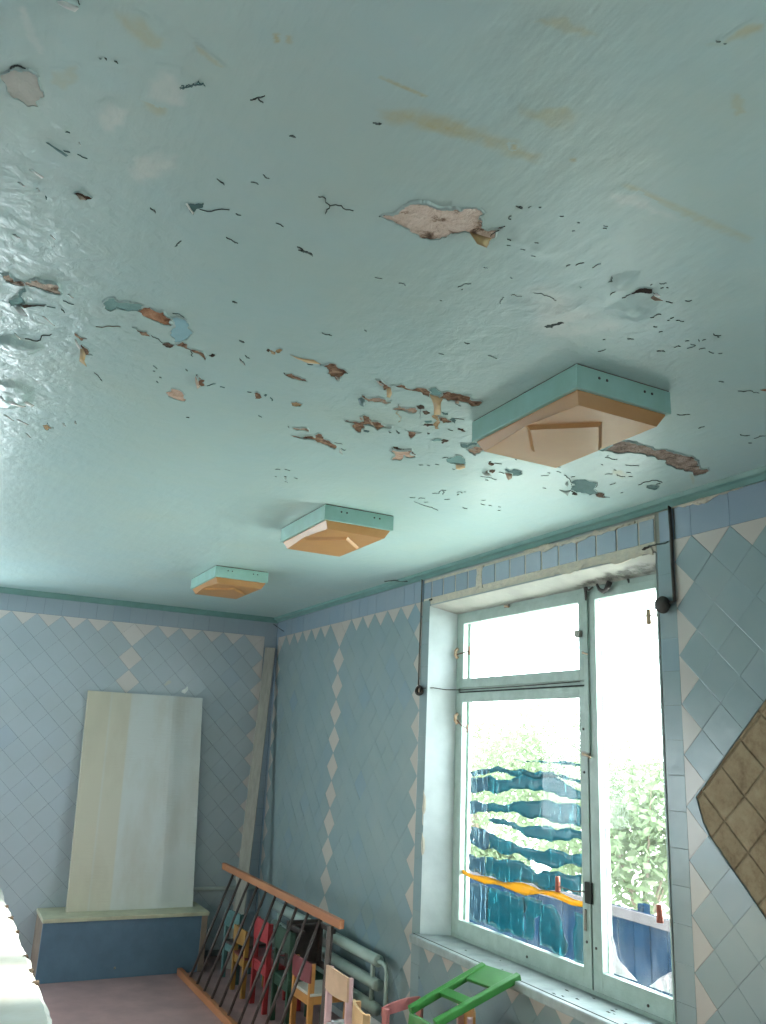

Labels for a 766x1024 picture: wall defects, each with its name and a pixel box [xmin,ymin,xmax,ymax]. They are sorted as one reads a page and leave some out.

peeling [0,64,45,107]
crack [318,196,354,214]
peeling [379,199,541,257]
peeling [1,272,74,326]
peeling [96,296,215,360]
peeling [267,348,348,382]
peeling [288,426,345,455]
peeling [343,378,523,481]
peeling [542,440,711,498]